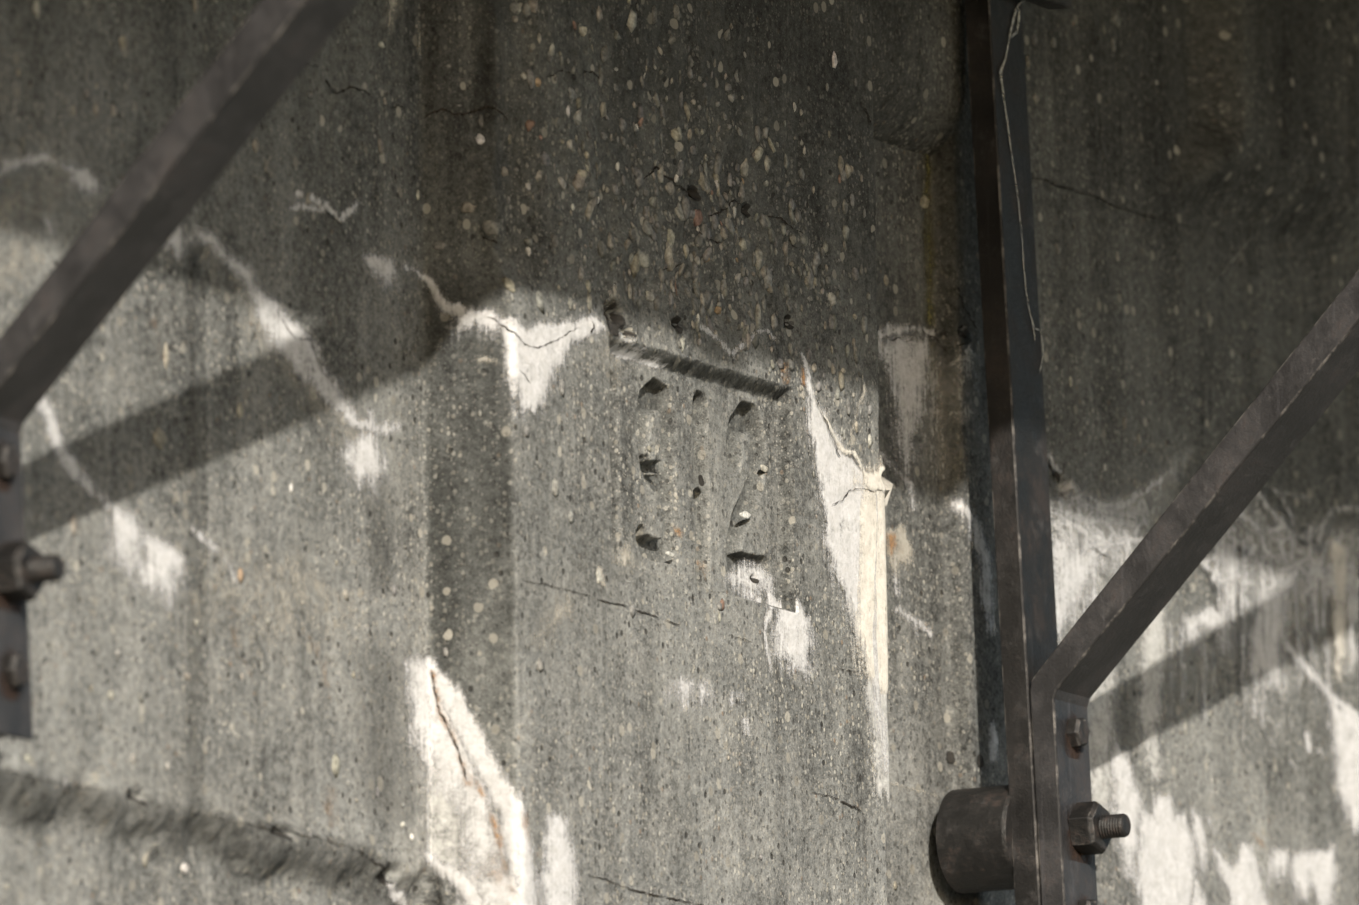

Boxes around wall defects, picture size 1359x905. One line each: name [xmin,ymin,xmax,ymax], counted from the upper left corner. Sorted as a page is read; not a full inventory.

efflorescence [0,151,101,205]
efflorescence [289,190,358,236]
efflorescence [164,224,400,492]
efflorescence [361,253,605,414]
efflorescence [609,343,668,368]
efflorescence [36,397,186,610]
efflorescence [192,528,218,553]
damp [800,154,979,800]
efflorescence [1048,454,1179,641]
damp [404,656,579,905]
efflorescence [1087,490,1359,905]